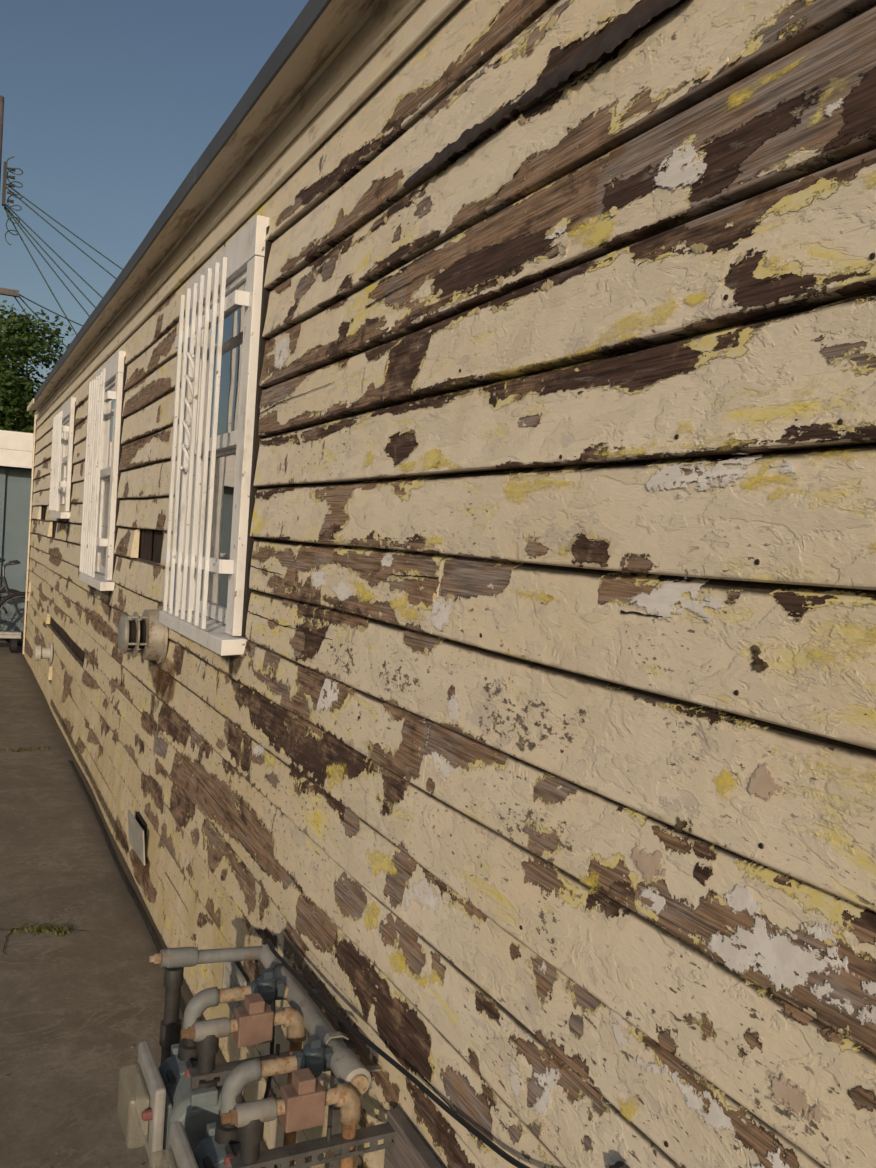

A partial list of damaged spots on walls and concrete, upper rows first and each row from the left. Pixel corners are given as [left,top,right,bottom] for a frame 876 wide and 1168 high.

peeling [75,400,86,430]
peeling [119,290,177,531]
peeling [257,0,876,447]
peeling [24,418,876,1168]